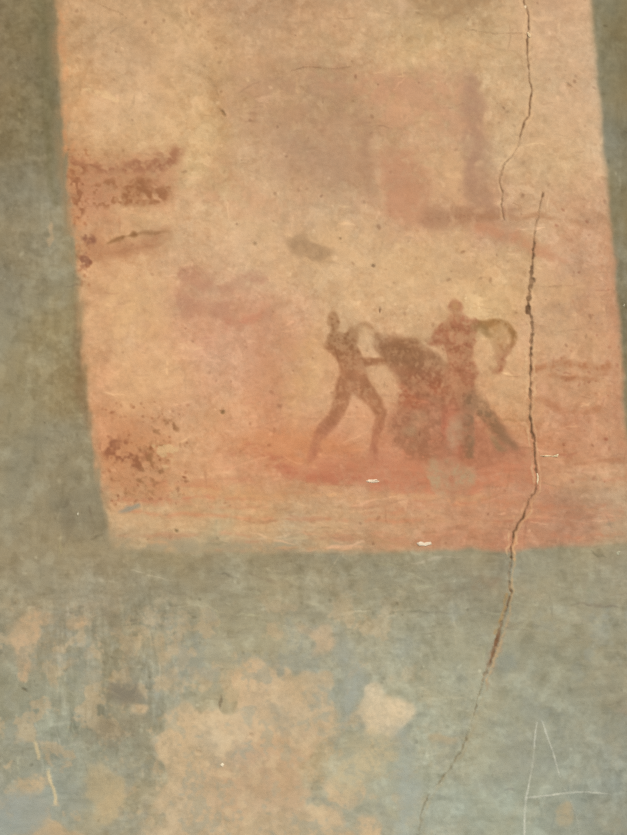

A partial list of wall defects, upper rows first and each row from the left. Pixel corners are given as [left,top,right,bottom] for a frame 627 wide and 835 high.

crack [464,0,538,223]
crack [420,191,545,835]